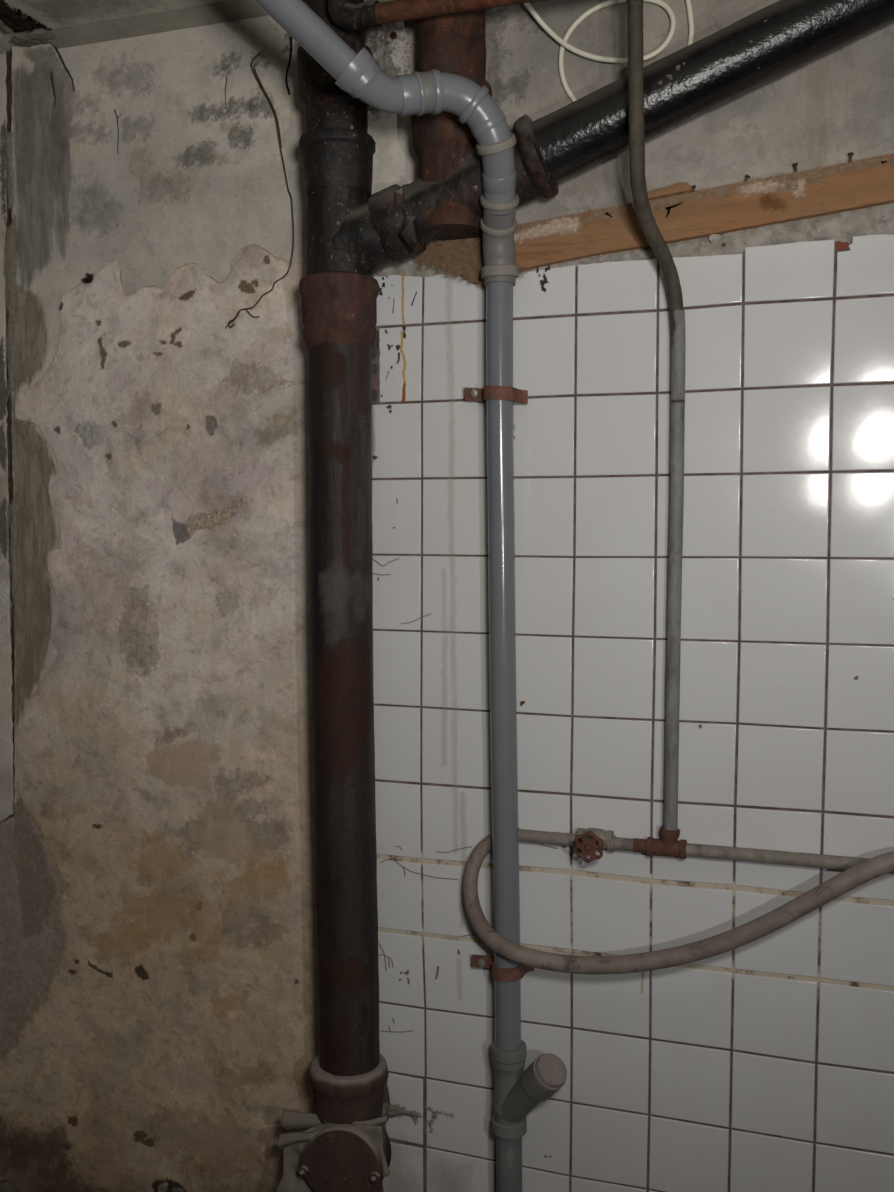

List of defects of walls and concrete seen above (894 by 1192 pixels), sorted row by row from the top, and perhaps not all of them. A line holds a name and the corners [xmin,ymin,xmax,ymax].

spalling [667,203,894,257]
spalling [371,257,446,278]
spalling [522,247,657,273]
damp [12,289,55,722]
flaking render [0,121,319,1192]